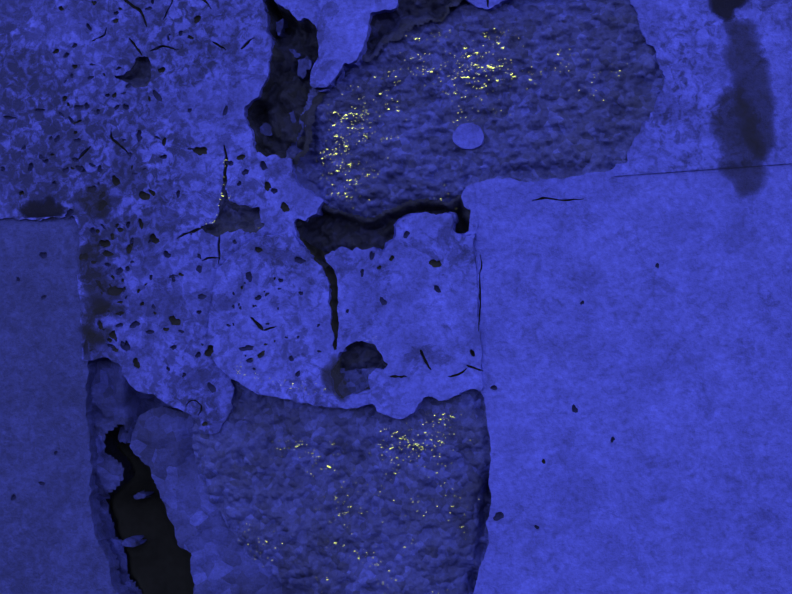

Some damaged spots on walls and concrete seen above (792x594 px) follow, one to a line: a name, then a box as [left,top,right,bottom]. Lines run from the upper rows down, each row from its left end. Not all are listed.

spalling [59,96,100,143]
spalling [63,157,106,194]
spalling [188,147,207,156]
spalling [223,154,249,186]
spalling [247,0,665,269]
spalling [139,189,156,200]
spalling [191,182,265,244]
crack [302,238,339,350]
crack [476,255,484,331]
crack [251,317,275,331]
crack [449,349,481,377]